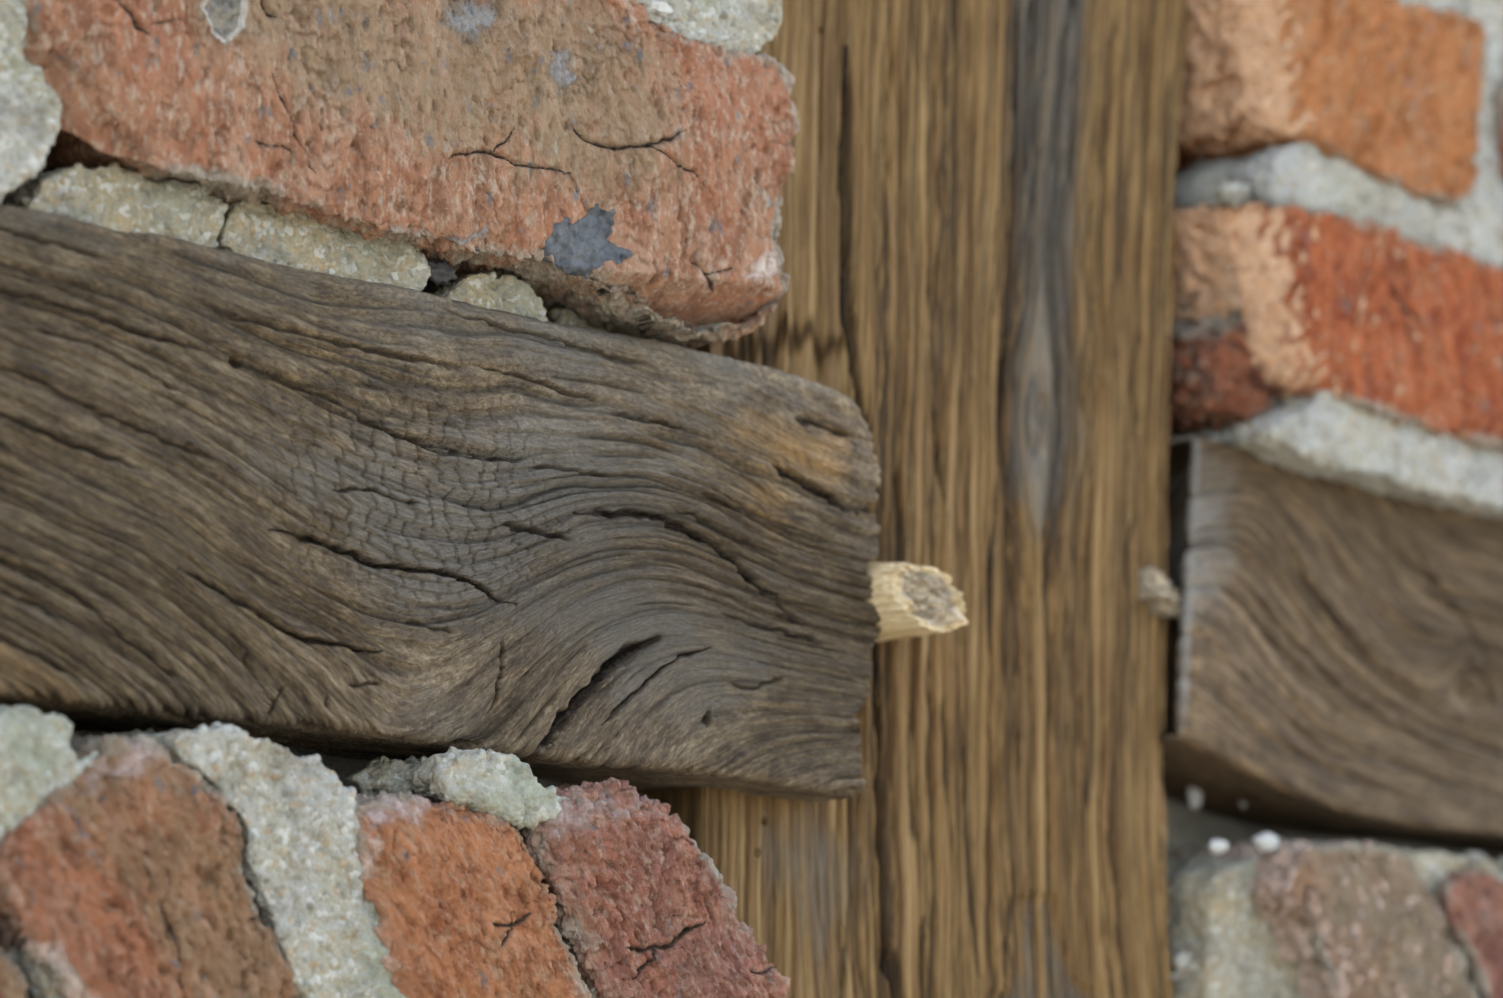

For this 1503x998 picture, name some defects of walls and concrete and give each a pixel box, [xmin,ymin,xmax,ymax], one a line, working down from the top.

crack [450,126,699,178]
crack [535,634,712,750]
crack [626,921,705,980]